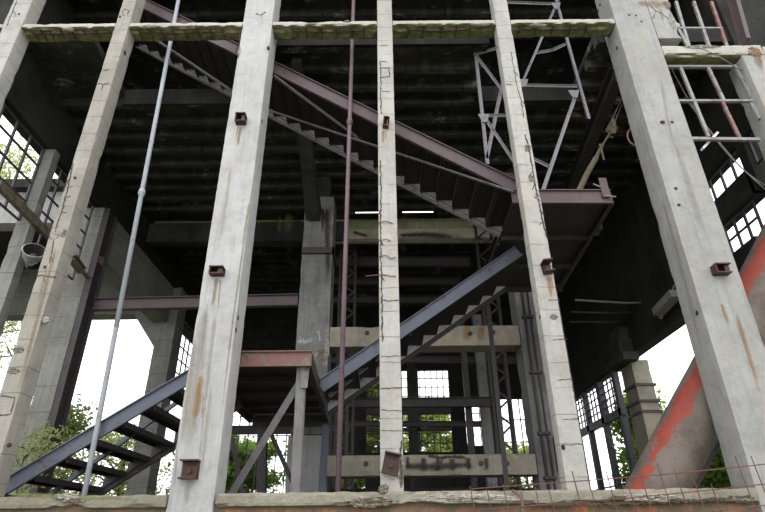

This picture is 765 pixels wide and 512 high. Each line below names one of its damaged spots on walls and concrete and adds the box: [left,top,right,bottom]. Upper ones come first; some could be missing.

crack [525,135,547,238]
crack [378,160,398,357]
rust [737,317,756,376]
rust [195,378,204,415]
crack [382,430,403,487]